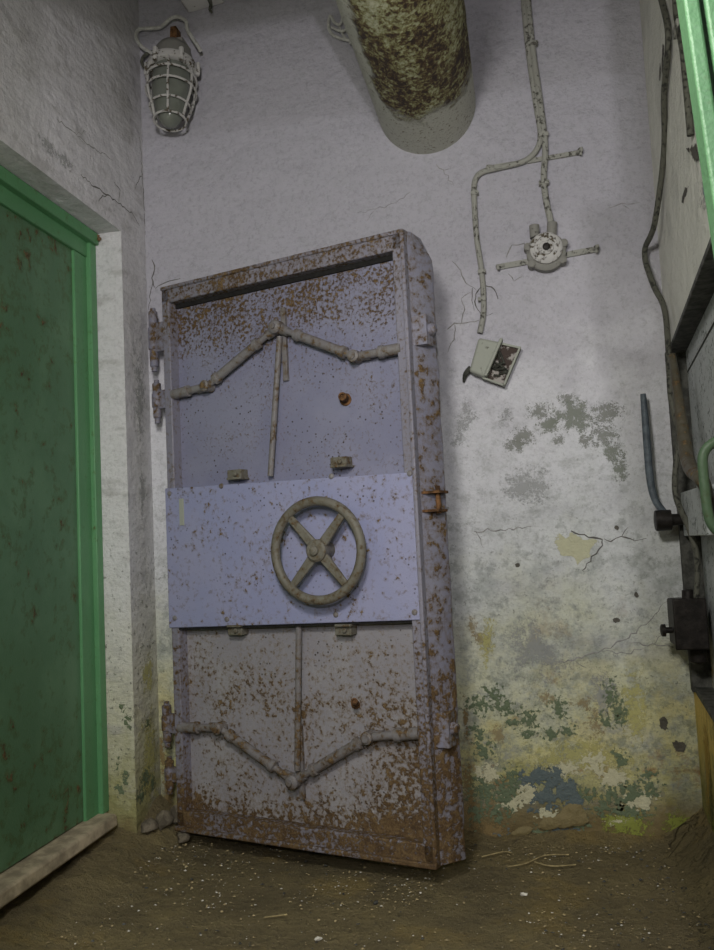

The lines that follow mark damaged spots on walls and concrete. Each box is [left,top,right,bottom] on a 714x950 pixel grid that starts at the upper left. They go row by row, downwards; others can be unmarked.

peeling [461,676,666,837]